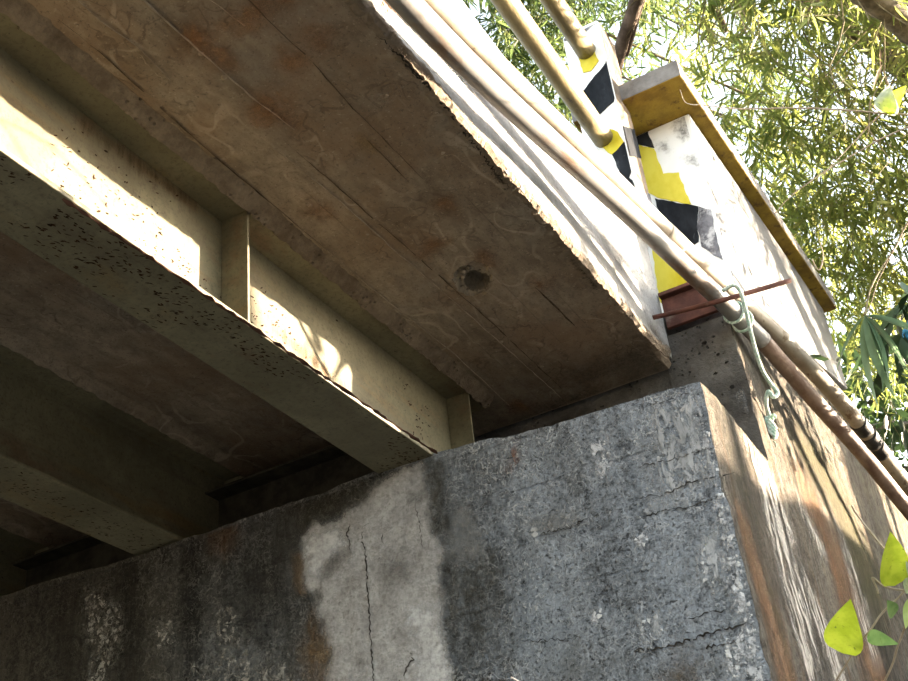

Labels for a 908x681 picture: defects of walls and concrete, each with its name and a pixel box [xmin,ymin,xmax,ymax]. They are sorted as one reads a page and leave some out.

crack [375,37,510,190]
spalling [344,0,671,359]
crack [346,523,383,681]
crack [628,609,753,652]
damp [734,439,846,681]
damp [836,525,893,681]